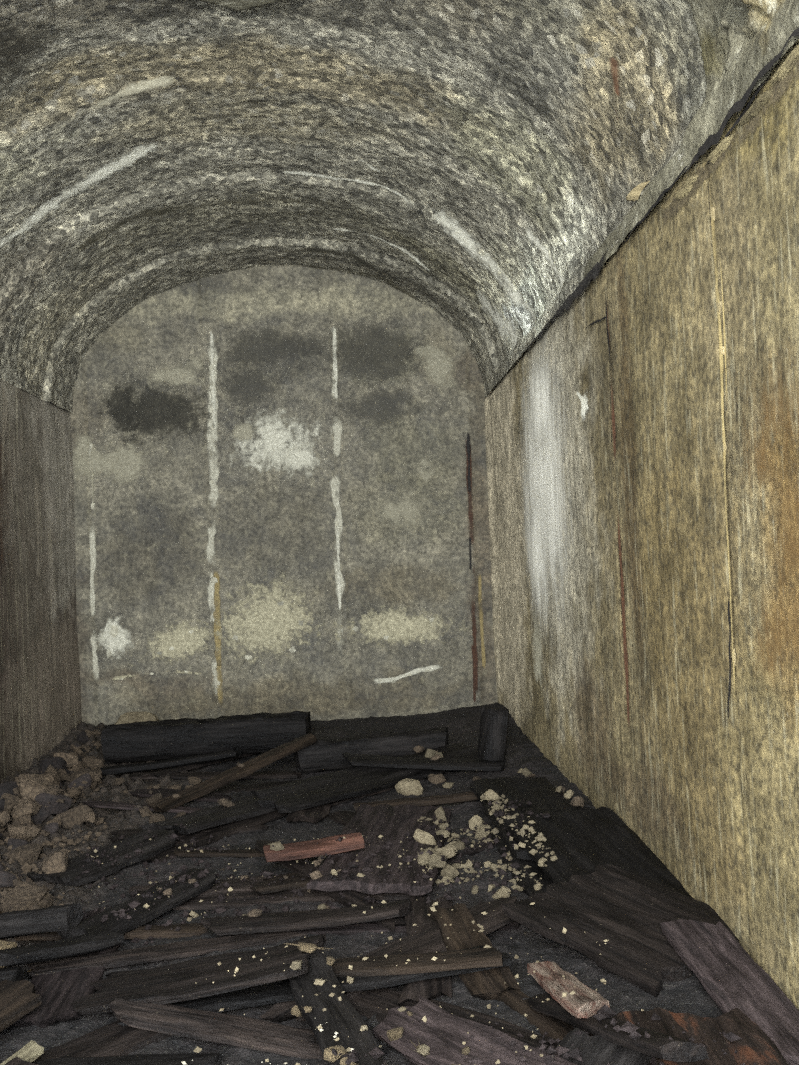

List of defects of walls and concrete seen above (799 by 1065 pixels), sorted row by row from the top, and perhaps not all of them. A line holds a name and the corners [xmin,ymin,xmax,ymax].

damp [72,329,343,510]
damp [331,327,455,399]
damp [577,393,588,419]
damp [89,528,97,616]
damp [90,630,99,679]
damp [206,521,222,702]
damp [329,476,345,650]
corrosion [466,433,486,701]
damp [522,358,566,685]